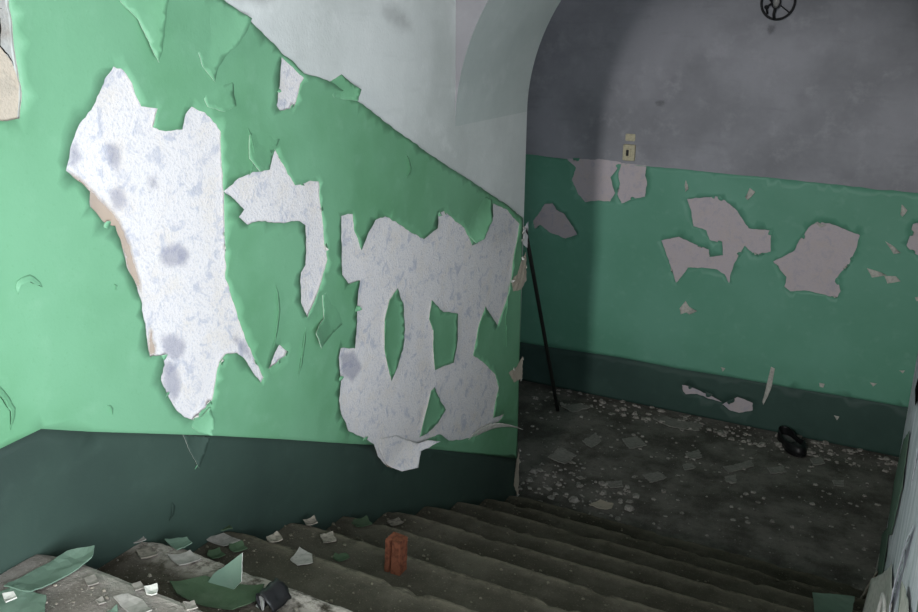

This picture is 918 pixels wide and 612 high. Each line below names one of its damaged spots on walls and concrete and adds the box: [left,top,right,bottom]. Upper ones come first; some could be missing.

spalling [0,0,19,121]
peeling [330,74,362,101]
peeling [66,0,342,467]
peeling [568,158,647,203]
peeling [661,181,860,299]
peeling [885,223,918,255]
peeling [339,197,577,471]
peeling [682,367,775,413]